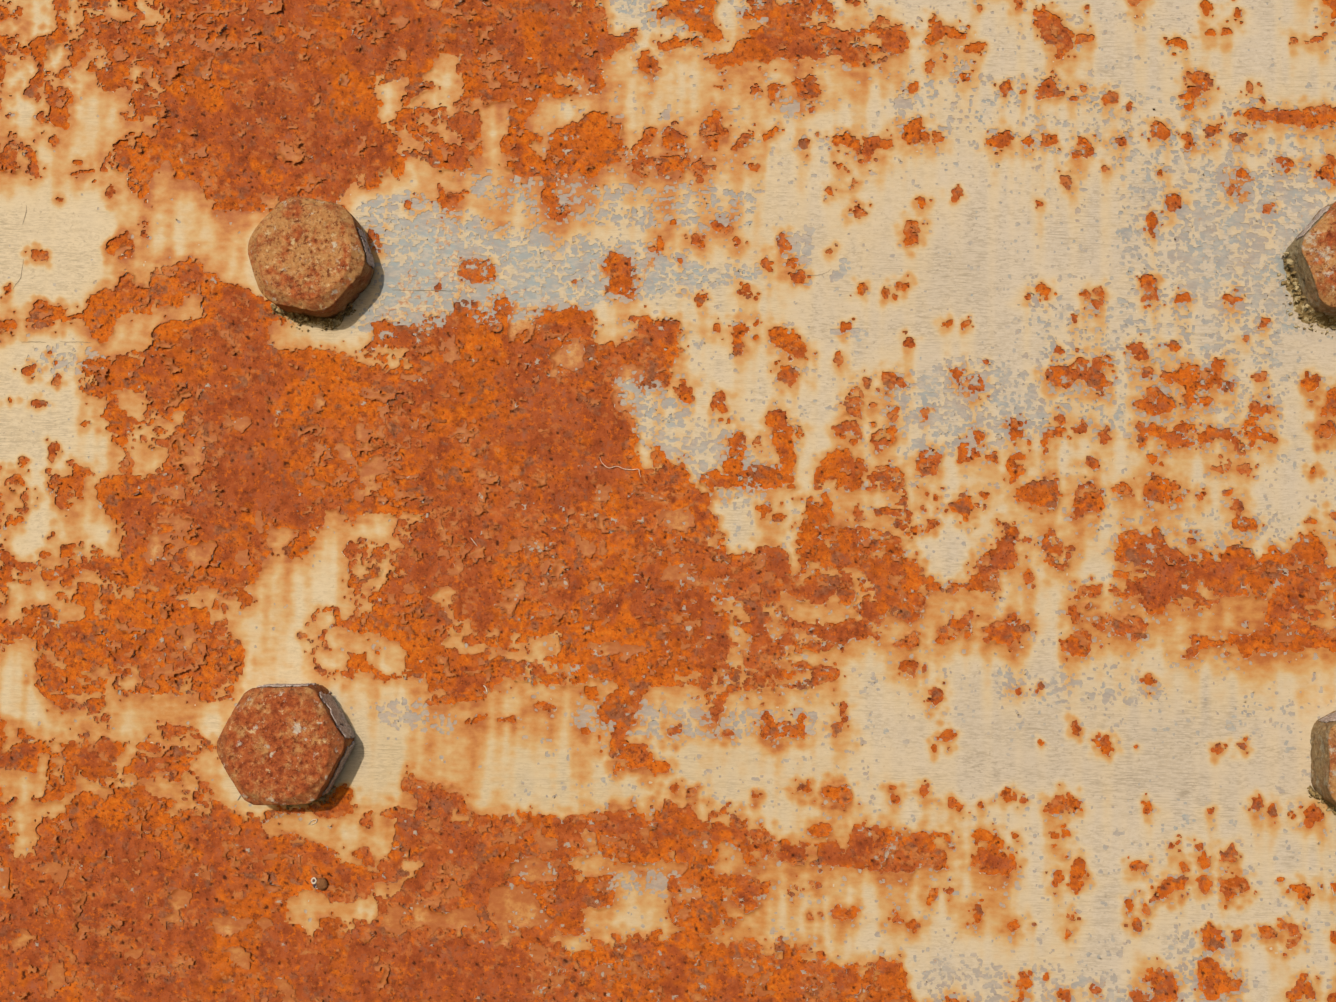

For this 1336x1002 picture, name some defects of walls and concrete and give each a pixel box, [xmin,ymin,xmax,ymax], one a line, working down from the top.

peeling [351,172,763,340]
peeling [884,65,1336,458]
corrosion [849,321,936,428]
corrosion [927,304,1007,427]
corrosion [1007,276,1131,552]
corrosion [1106,261,1299,519]
peeling [1099,516,1300,563]
peeling [574,704,818,741]
corrosion [1095,450,1336,1002]
peeling [609,871,682,894]
corrosion [901,670,1114,1002]
peeling [923,929,1249,1002]